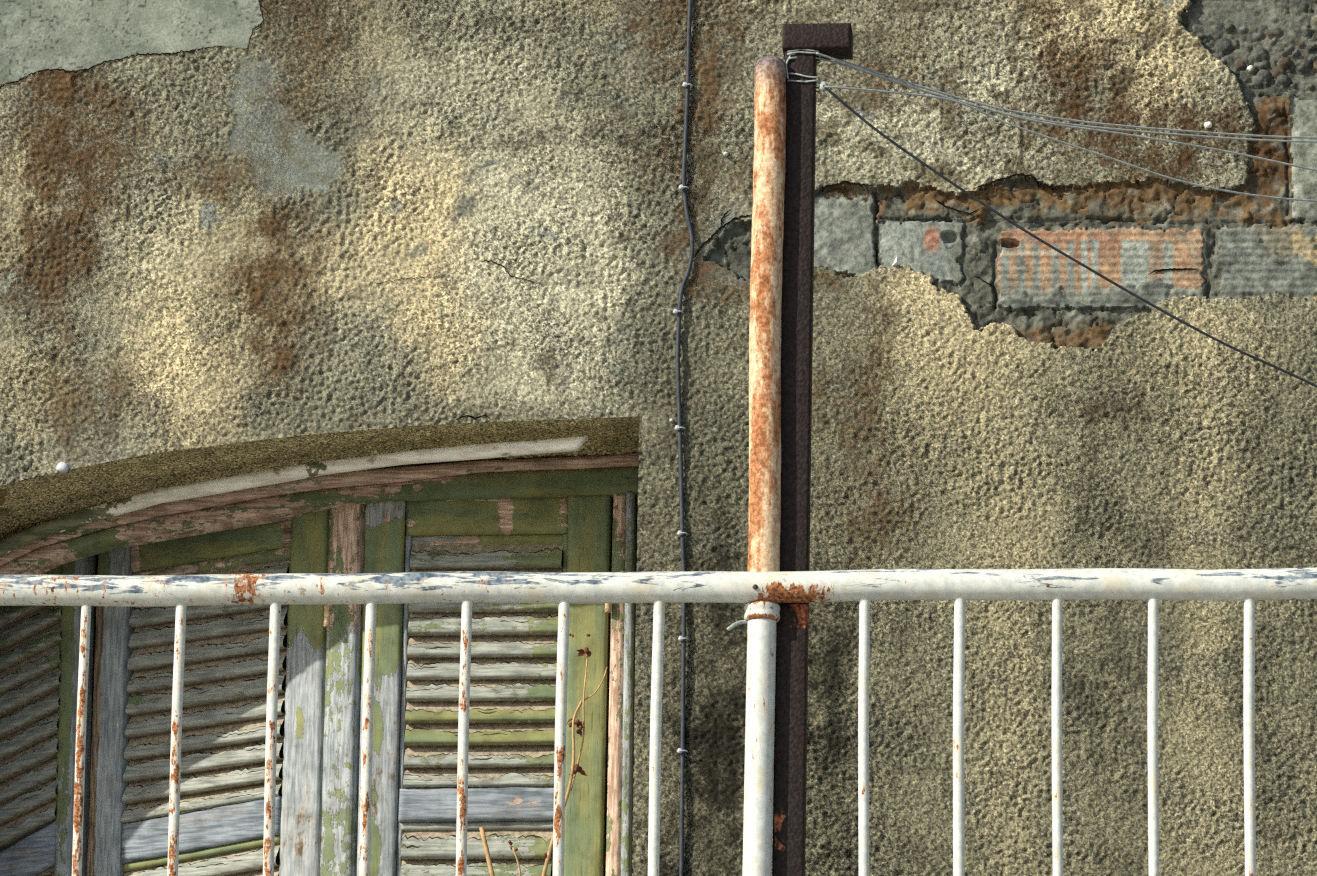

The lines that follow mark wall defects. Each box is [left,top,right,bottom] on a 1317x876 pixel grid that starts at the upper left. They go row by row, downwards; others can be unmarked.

spalling [705,219,752,281]
spalling [814,0,1317,351]
leakage [806,602,858,876]